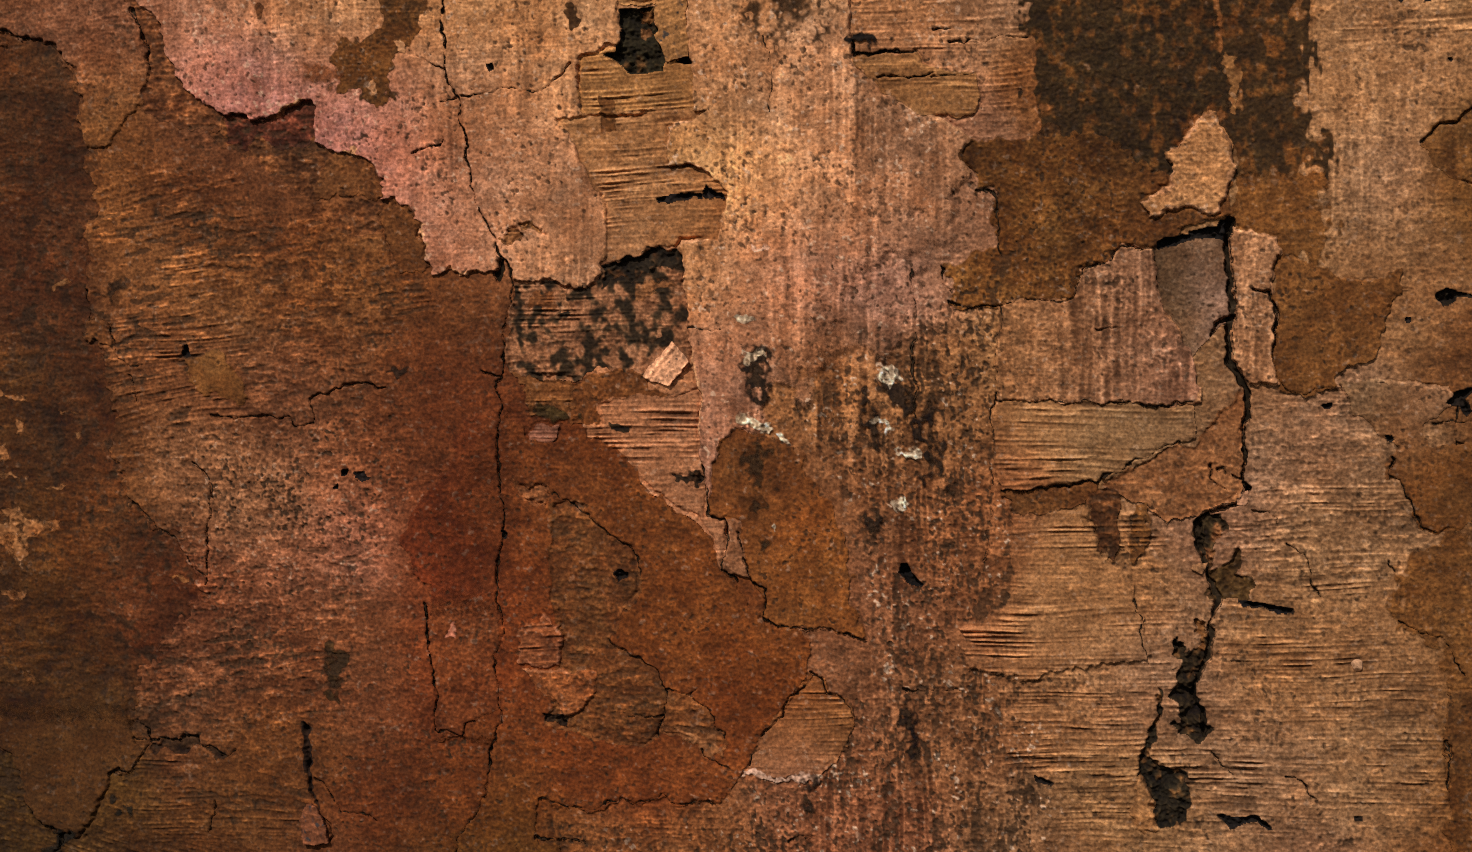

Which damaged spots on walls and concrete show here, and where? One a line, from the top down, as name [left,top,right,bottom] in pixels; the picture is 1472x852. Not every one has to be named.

damp [1014,0,1344,265]
crack [1420,109,1470,143]
flaking render [0,0,224,727]
flaking render [136,0,1256,852]
crack [909,245,1193,492]
crack [1191,216,1351,775]
crack [1133,598,1157,685]
flaking render [1442,689,1472,852]